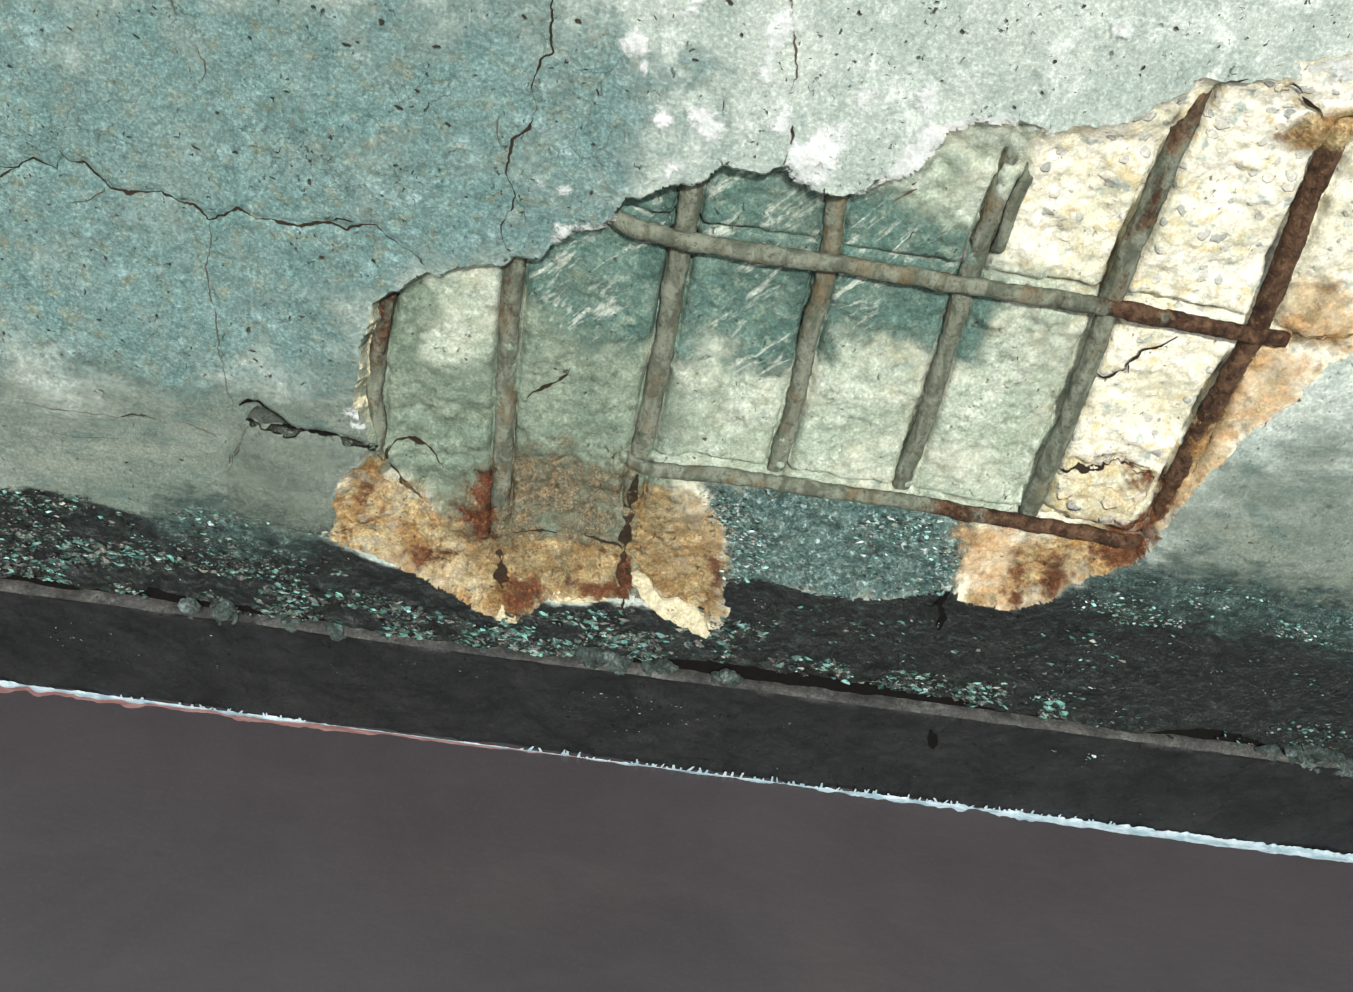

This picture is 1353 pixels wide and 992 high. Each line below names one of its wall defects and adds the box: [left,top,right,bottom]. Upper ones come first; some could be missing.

crack [496,0,554,247]
peeling [619,26,649,73]
rust [1275,109,1353,151]
crack [0,150,444,499]
spalling [329,272,445,534]
spalling [448,256,537,519]
spalling [472,605,520,624]
rust [329,438,727,623]
crack [525,368,570,402]
spalling [536,590,608,606]
spalling [554,54,1353,639]
rust [952,282,1353,610]